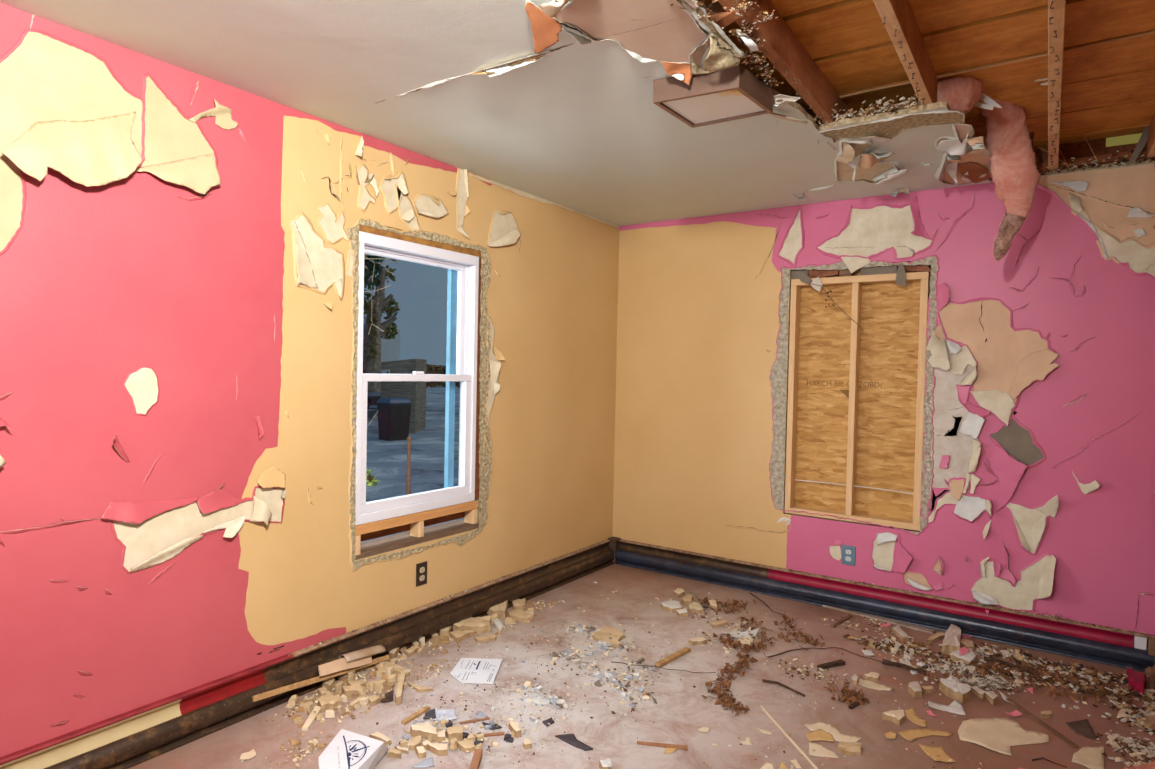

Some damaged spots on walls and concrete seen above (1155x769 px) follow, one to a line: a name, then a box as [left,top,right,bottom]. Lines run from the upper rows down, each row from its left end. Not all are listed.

peeling [0,15,252,256]
crack [377,43,574,103]
peeling [525,0,759,85]
flaking render [773,94,800,107]
peeling [819,110,993,186]
peeling [1038,164,1155,273]
peeling [123,366,160,416]
flaking render [289,136,620,572]
peeling [756,191,1060,615]
peeling [0,466,287,574]